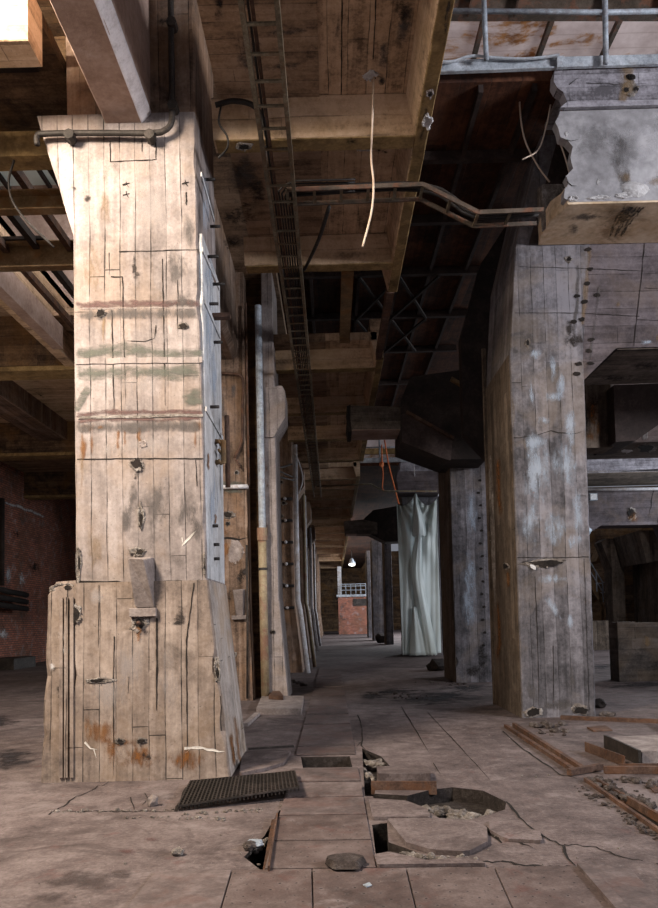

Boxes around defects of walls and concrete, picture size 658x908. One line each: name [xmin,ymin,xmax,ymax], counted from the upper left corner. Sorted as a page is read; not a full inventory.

damp [81,297,195,320]
damp [78,364,198,380]
spalling [503,558,565,570]
crack [401,706,485,774]
corrosion [176,750,200,768]
crack [502,731,574,778]
crack [483,801,658,866]